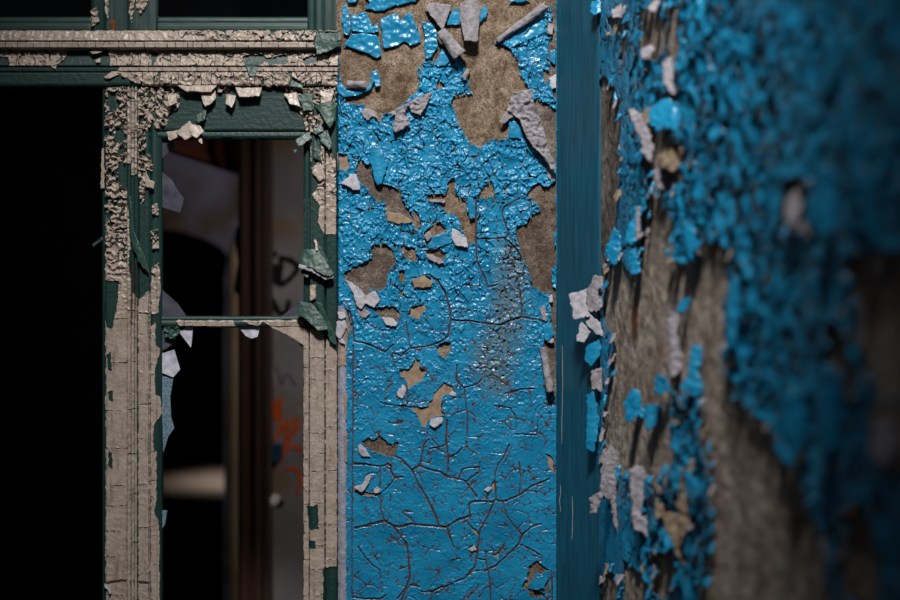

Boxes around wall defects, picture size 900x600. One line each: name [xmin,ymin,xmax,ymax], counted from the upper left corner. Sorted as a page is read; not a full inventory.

peeling [0,50,123,112]
peeling [104,280,120,329]
peeling [118,161,155,299]
peeling [160,0,557,600]
crack [346,198,549,600]
peeling [569,0,839,600]
peeling [816,245,900,405]